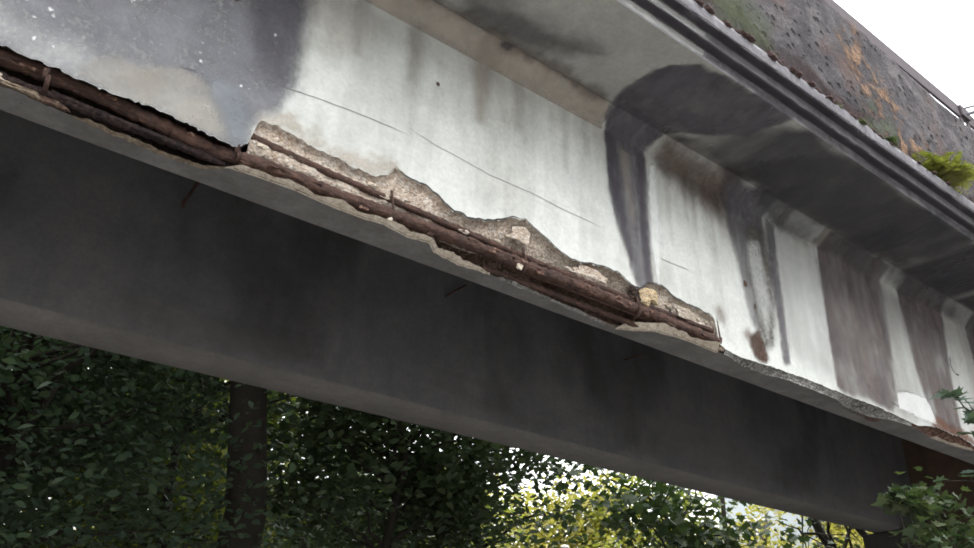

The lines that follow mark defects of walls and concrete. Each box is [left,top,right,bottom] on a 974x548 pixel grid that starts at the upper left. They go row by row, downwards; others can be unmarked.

leakage [0,0,304,147]
spalling [0,45,725,354]
crack [287,88,599,226]
leakage [366,0,974,431]
corrosion [751,331,769,362]
spalling [911,423,974,451]